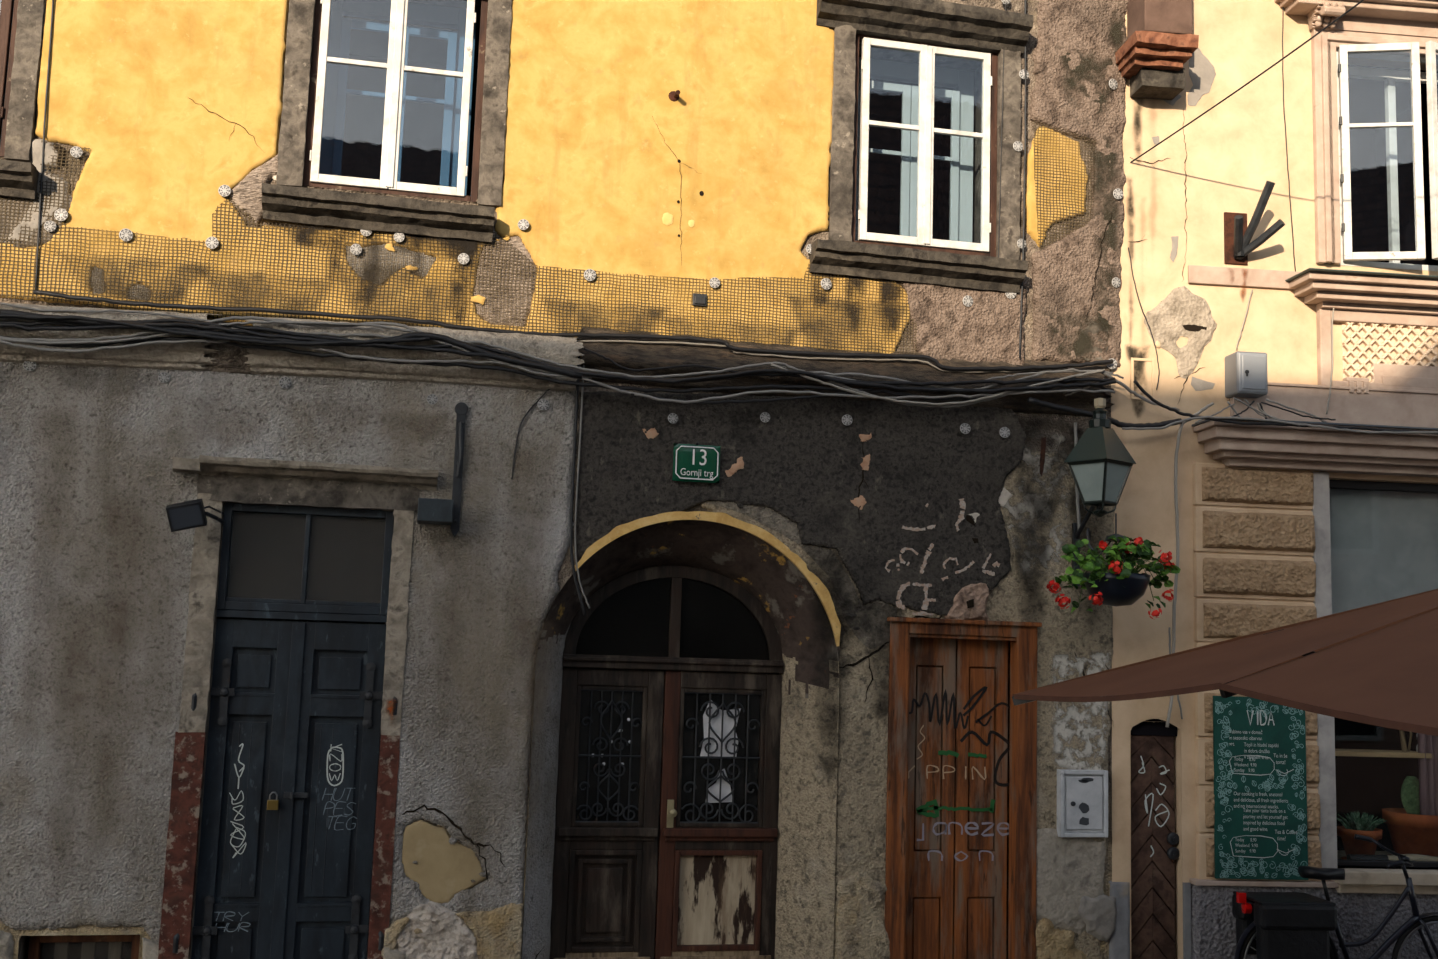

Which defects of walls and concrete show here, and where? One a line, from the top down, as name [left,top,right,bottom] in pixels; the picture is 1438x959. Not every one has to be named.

spalling [8,139,70,242]
spalling [229,154,278,227]
spalling [471,230,537,327]
spalling [1144,286,1217,391]
peeling [396,820,488,959]